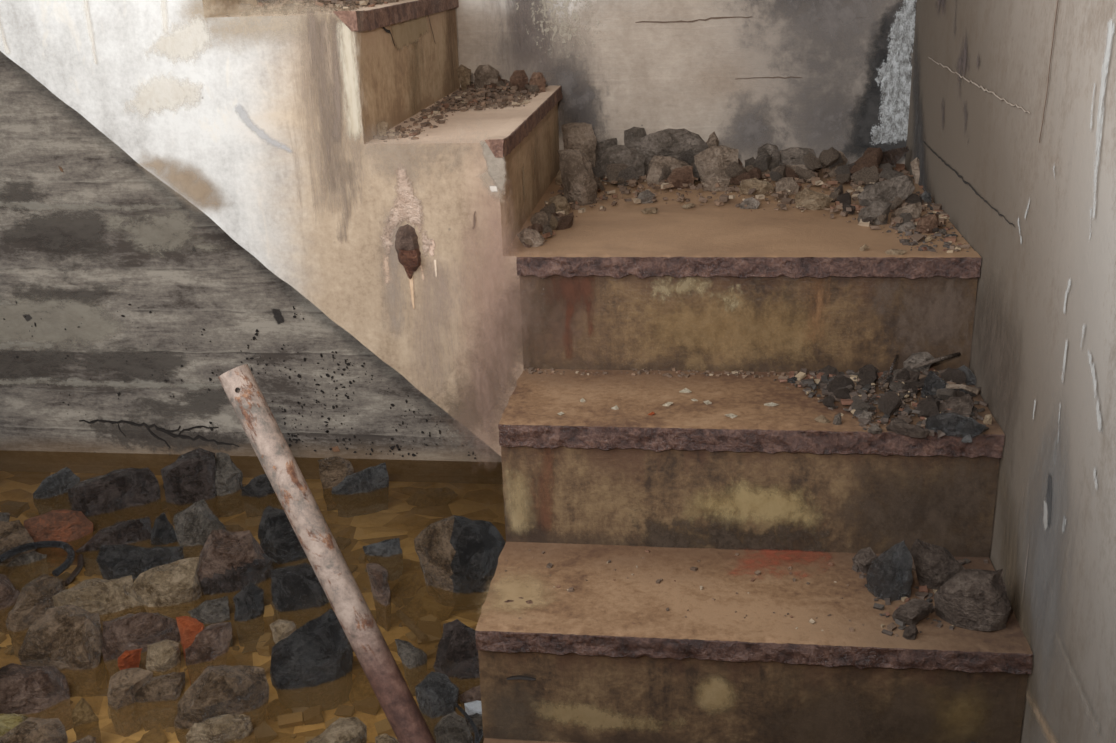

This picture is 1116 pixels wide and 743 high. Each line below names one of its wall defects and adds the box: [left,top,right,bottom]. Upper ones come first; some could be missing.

crack [635,15,752,23]
leakage [782,0,927,191]
crack [928,0,1059,143]
leakage [0,182,111,268]
spalling [381,167,435,283]
crack [923,141,1015,227]
leakage [14,284,110,305]
crack [79,419,239,448]